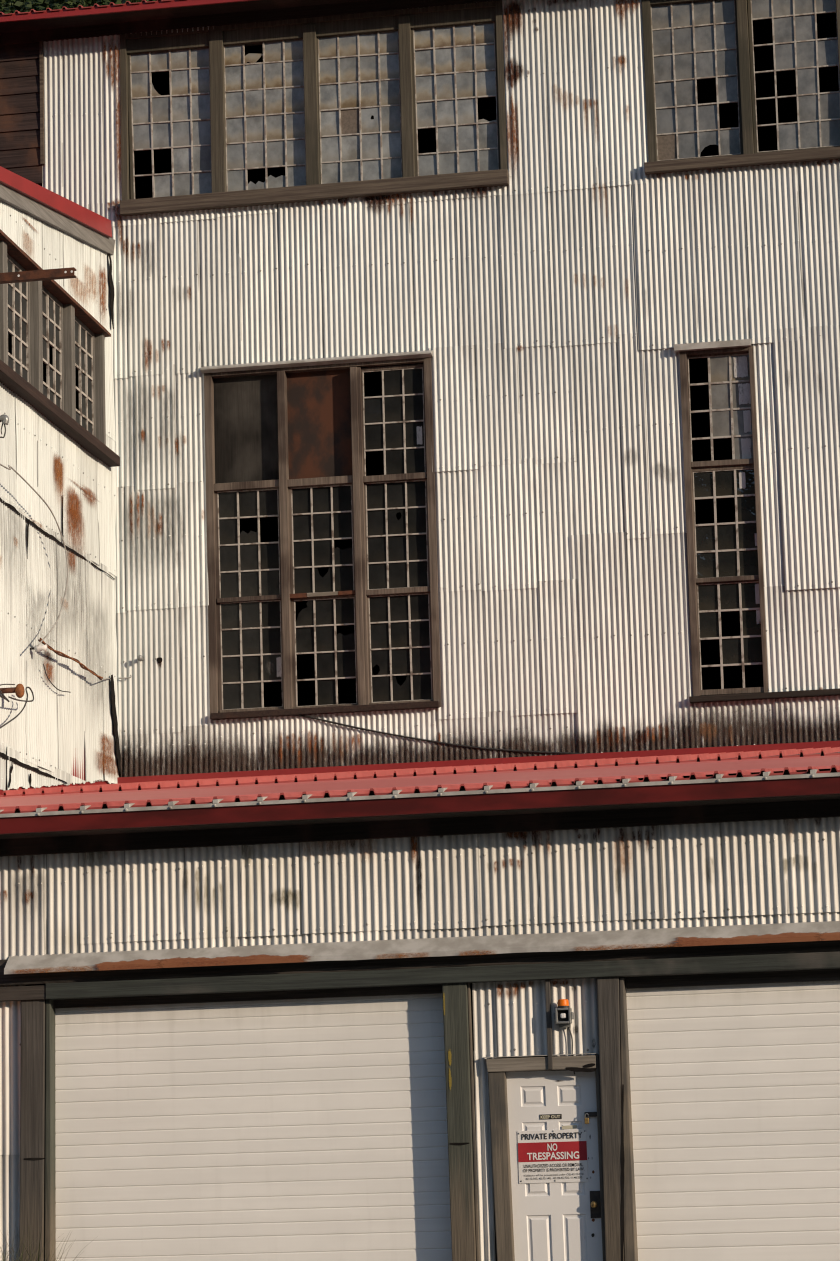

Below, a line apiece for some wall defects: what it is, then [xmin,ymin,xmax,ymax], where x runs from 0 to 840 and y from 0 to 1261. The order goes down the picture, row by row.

rust [503,4,538,159]
rust [103,42,121,179]
rust [107,201,140,258]
rust [55,458,96,568]
rust [279,733,323,765]
water stain [119,715,840,777]
rust [597,725,668,747]
rust [15,954,310,974]
rust [576,932,840,951]